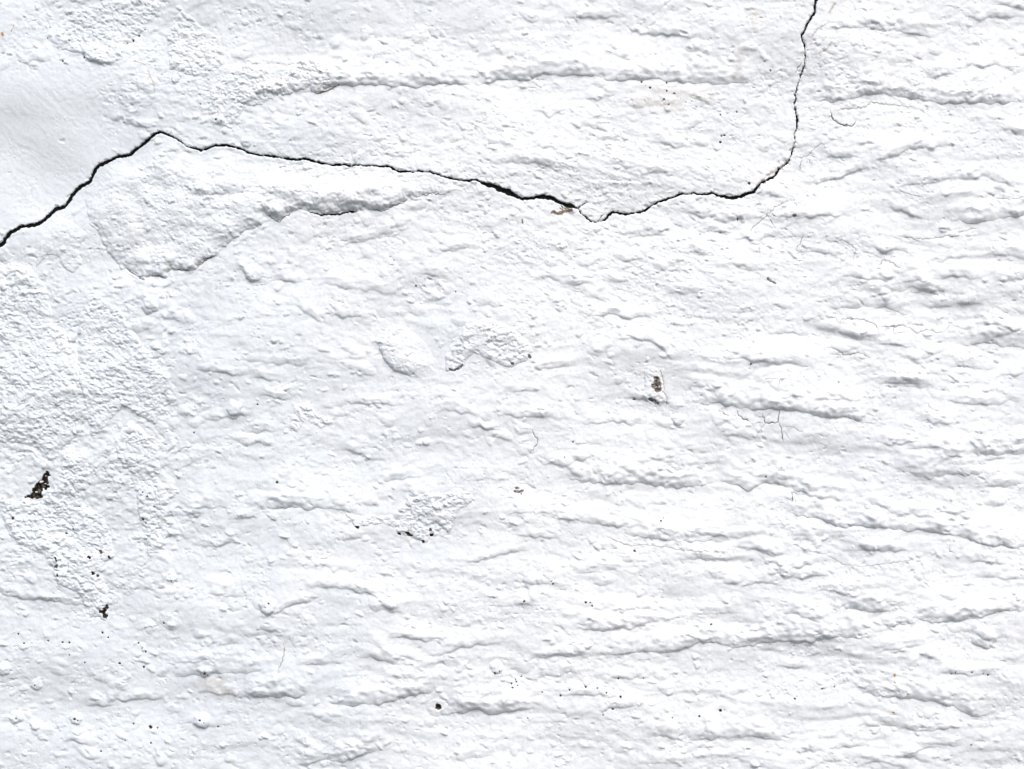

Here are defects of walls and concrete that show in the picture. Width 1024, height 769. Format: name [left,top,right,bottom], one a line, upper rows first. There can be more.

crack [0,0,821,252]
peeling [0,262,177,621]